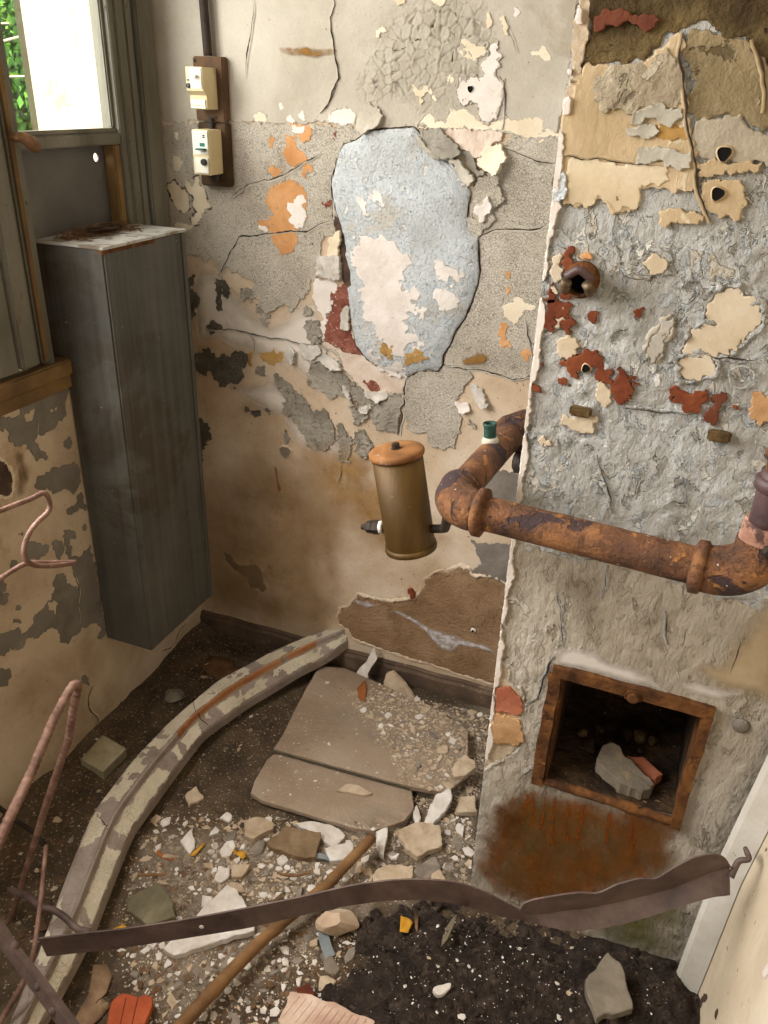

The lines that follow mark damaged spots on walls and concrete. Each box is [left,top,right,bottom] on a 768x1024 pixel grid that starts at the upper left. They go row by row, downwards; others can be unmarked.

crack [319,0,665,167]
crack [675,34,711,223]
crack [219,153,335,280]
peeling [151,0,768,546]
peeling [0,389,87,515]
peeling [0,524,106,687]
peeling [335,536,768,909]
rust [482,791,668,898]
peeling [577,900,703,963]